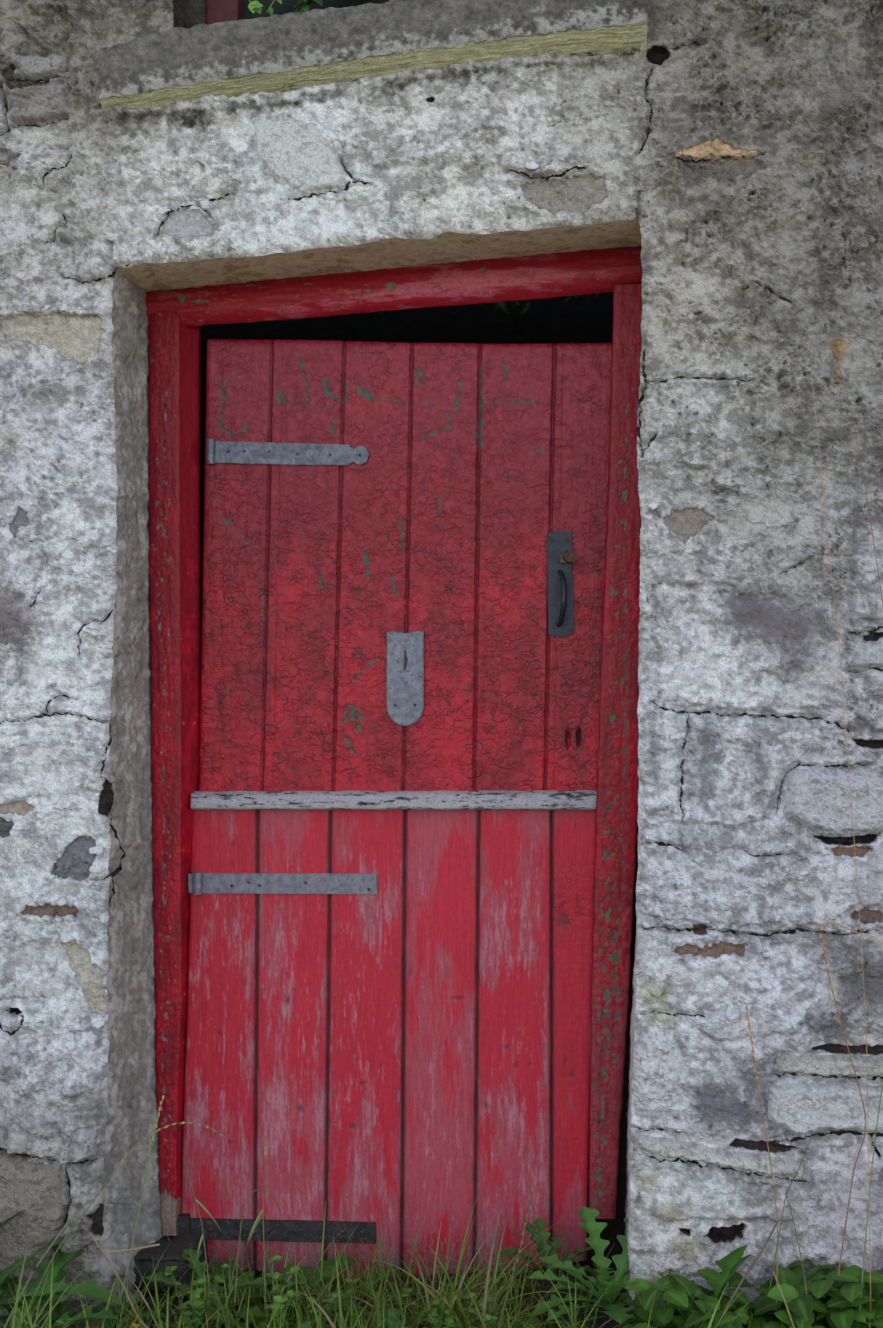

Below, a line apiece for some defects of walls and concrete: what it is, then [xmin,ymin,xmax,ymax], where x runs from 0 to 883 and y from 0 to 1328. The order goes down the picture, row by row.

crack [638,41,764,163]
spalling [675,138,766,181]
spalling [0,302,105,365]
crack [77,608,115,654]
spalling [0,799,35,838]
spalling [51,835,103,881]
spalling [21,897,79,918]
spalling [671,924,745,958]
spalling [60,934,108,1029]